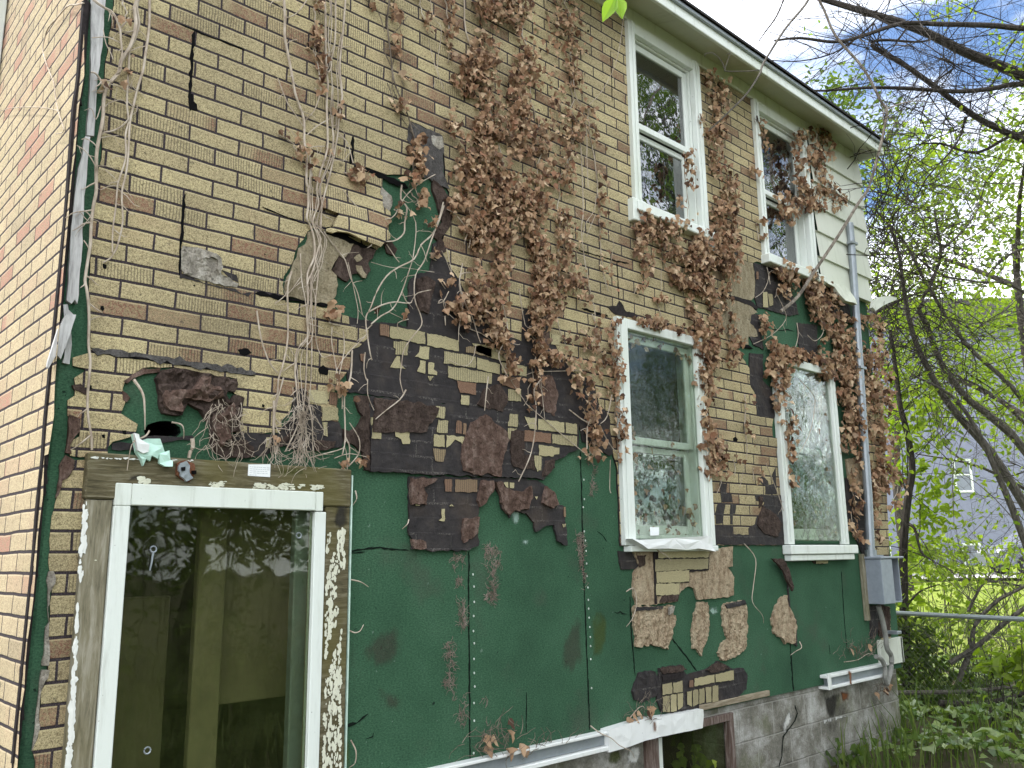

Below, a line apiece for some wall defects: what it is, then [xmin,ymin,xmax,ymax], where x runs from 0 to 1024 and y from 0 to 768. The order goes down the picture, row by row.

peeling [717,259,773,349]
peeling [308,390,339,437]
peeling [379,324,577,472]
peeling [171,459,193,482]
peeling [438,479,477,521]
peeling [77,501,97,583]
crack [351,545,407,553]
peeling [655,551,710,596]
peeling [322,527,346,768]
peeling [65,602,79,768]
peeling [662,670,734,712]
crack [779,706,798,767]